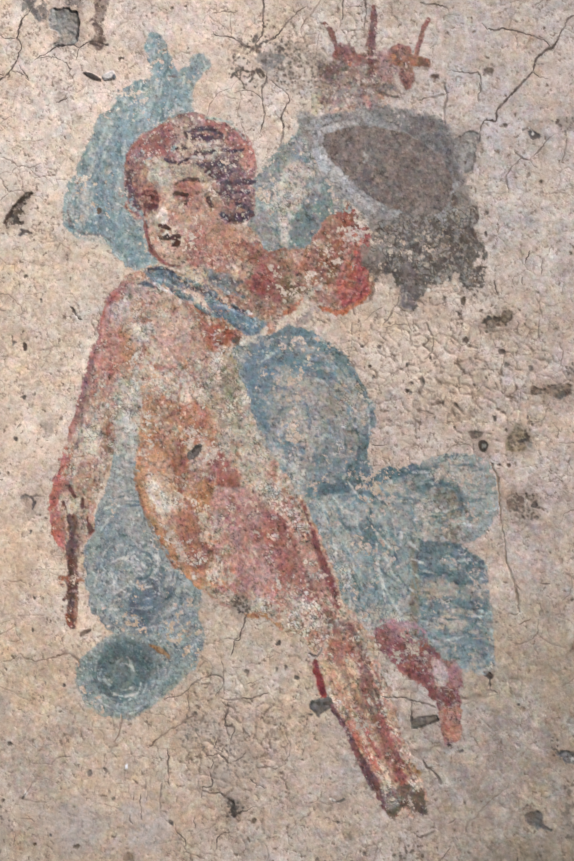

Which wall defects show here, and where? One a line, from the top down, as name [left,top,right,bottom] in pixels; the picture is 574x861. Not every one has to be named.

crack [0,6,108,81]
flaking render [20,0,111,51]
crack [212,0,367,61]
crack [420,1,448,9]
crack [417,15,574,142]
crack [206,73,291,148]
flaking render [2,190,35,237]